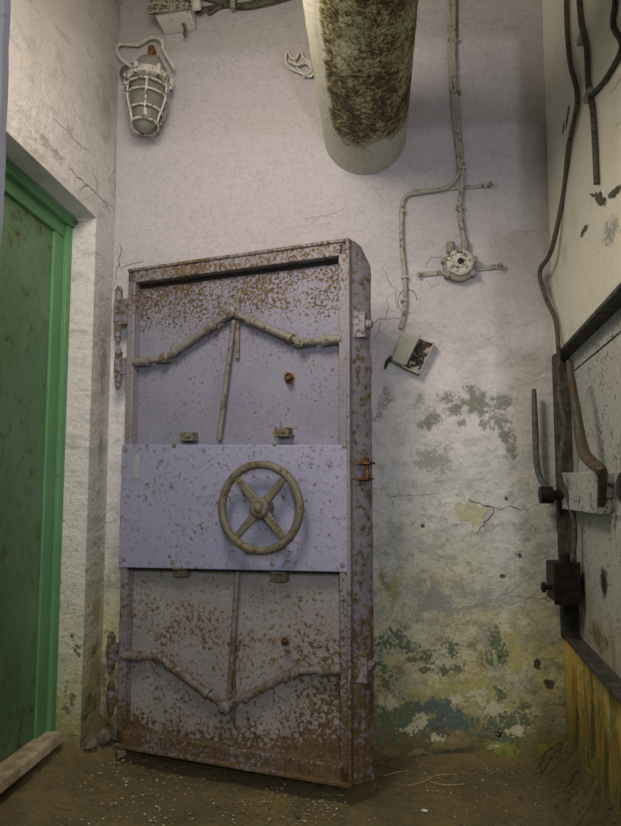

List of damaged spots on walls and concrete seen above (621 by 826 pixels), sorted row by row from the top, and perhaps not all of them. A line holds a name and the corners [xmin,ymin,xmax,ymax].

peeling [374,623,537,757]